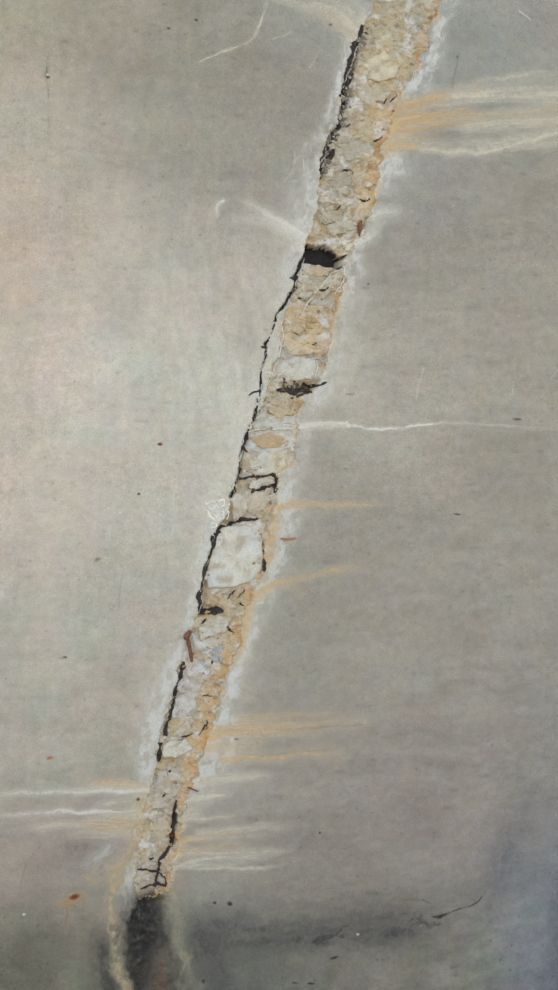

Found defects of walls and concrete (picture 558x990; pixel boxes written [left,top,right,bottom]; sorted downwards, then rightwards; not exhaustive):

crack [319,24,364,179]
corrosion [383,73,558,157]
crack [196,254,327,615]
spalling [132,0,439,899]
crack [156,661,186,762]
crack [137,800,177,890]
damp [94,858,435,990]